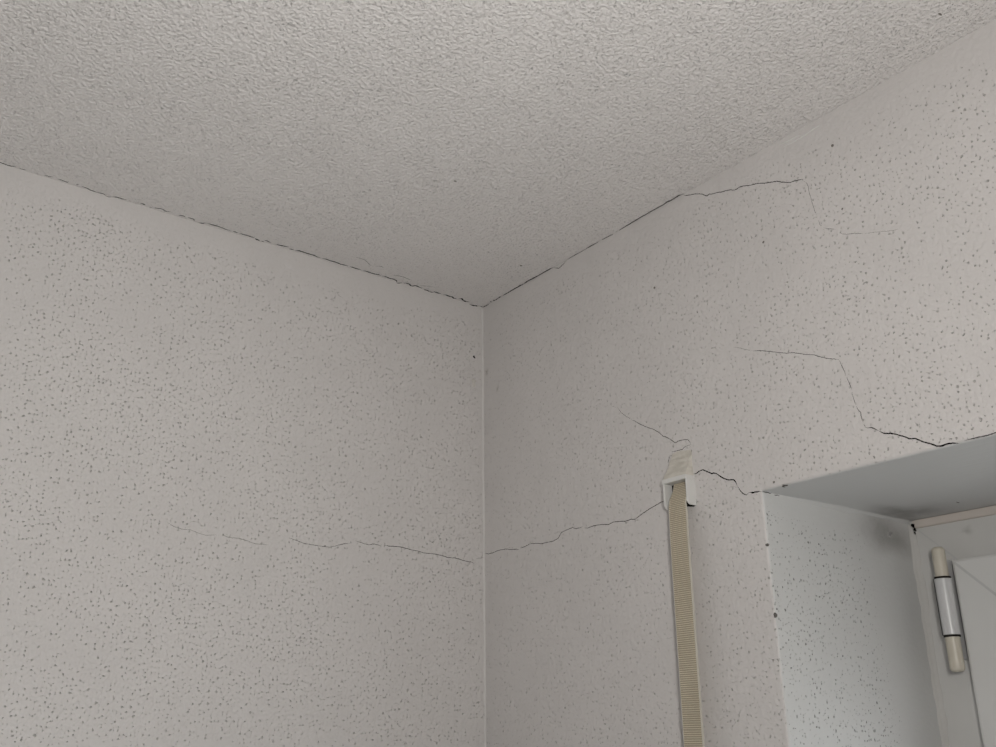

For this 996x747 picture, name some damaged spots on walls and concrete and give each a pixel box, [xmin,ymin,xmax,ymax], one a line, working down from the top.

crack [0,162,894,307]
crack [735,347,996,447]
crack [613,406,779,496]
crack [291,501,664,563]